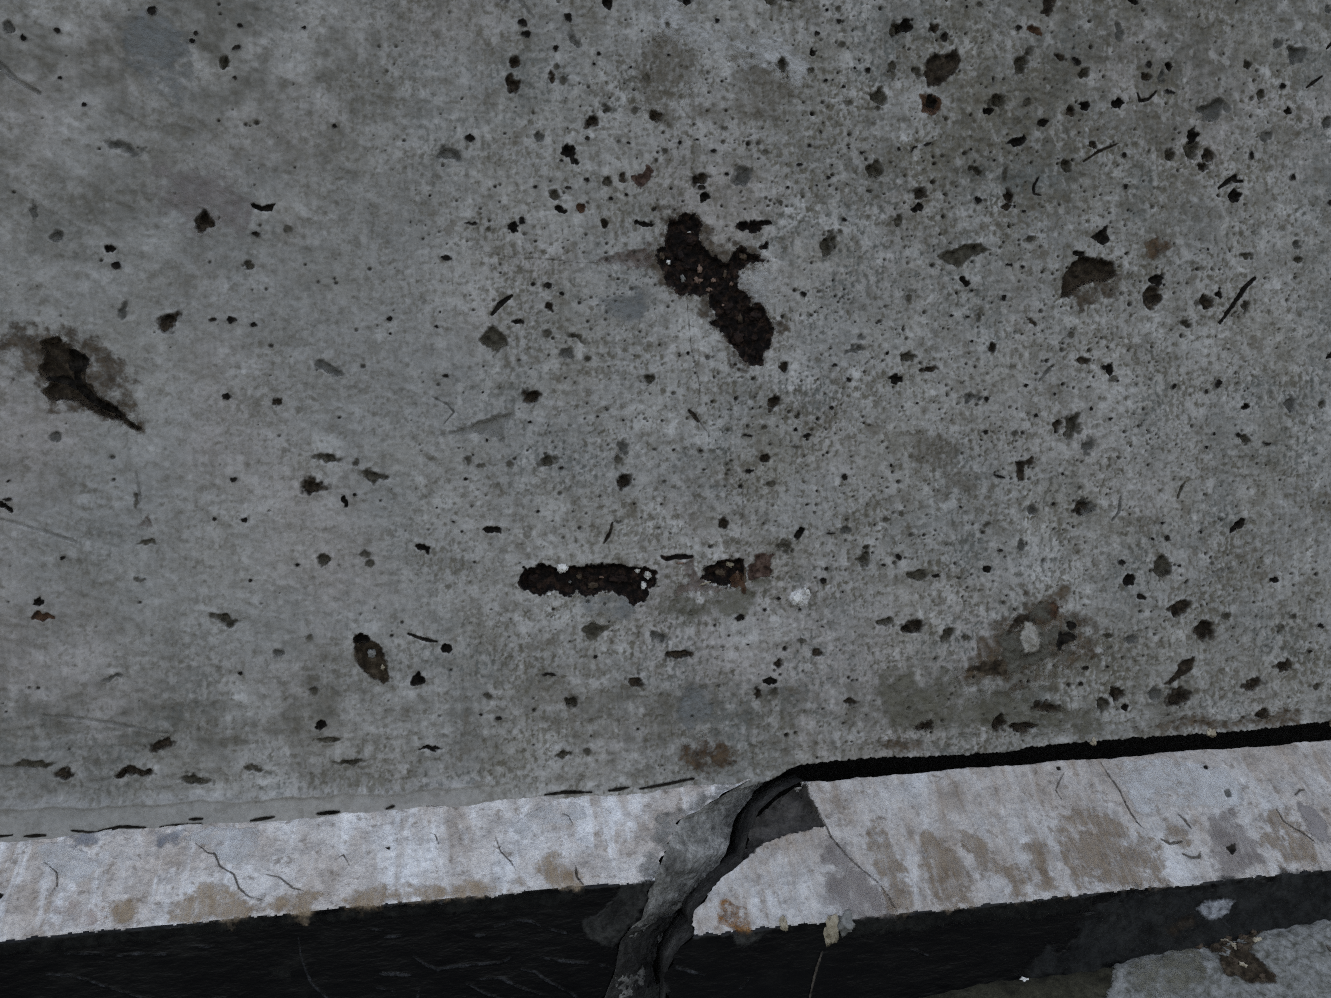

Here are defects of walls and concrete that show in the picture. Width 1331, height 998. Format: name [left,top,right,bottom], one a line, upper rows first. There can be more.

rust [599,209,790,372]
spalling [1060,225,1121,313]
spalling [38,336,142,431]
peeling [582,783,735,946]
spalling [743,782,825,860]